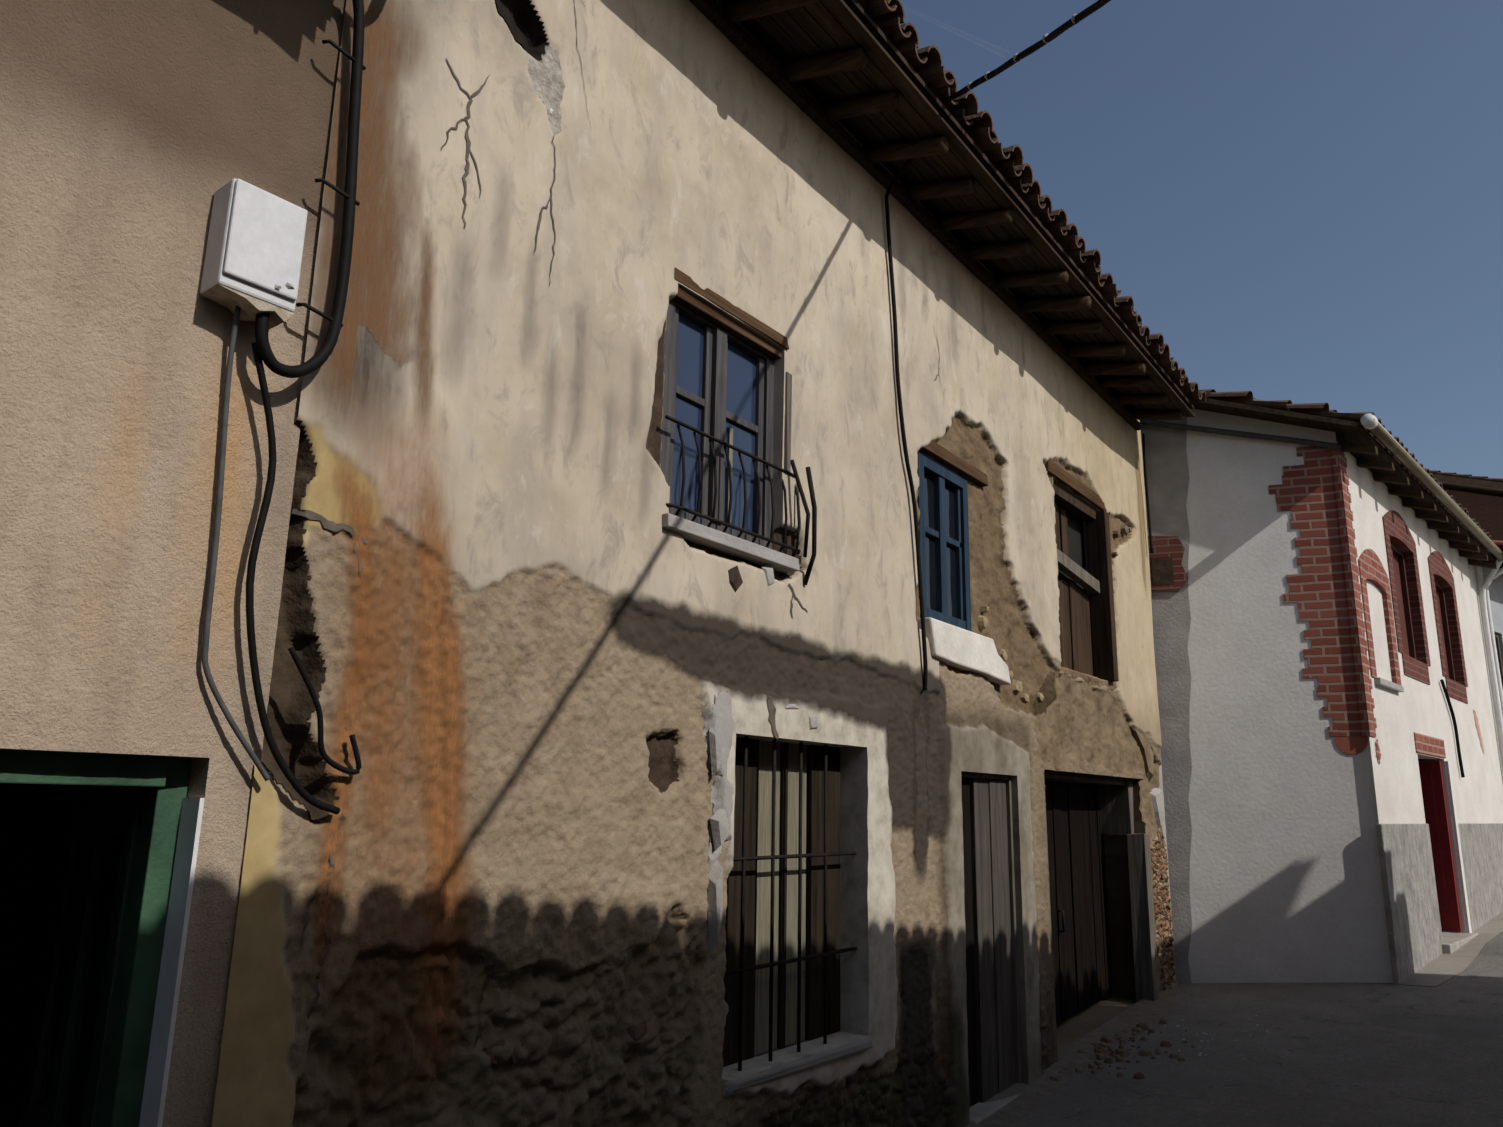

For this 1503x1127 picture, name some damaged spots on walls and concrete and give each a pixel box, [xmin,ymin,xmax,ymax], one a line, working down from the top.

flaking render [495,0,565,135]
crack [441,58,490,228]
crack [534,135,556,286]
flaking render [646,320,666,467]
flaking render [684,527,804,592]
flaking render [1109,515,1188,593]
flaking render [646,732,680,793]
flaking render [702,690,734,955]
flaking render [767,696,818,739]
flaking render [932,414,1176,992]